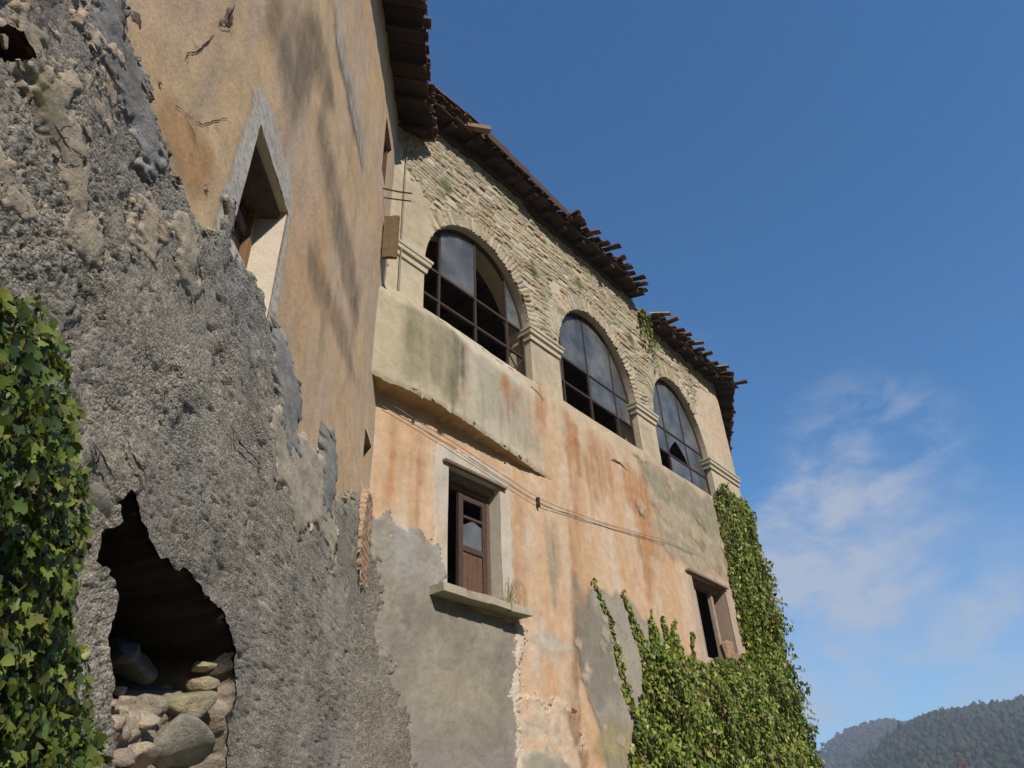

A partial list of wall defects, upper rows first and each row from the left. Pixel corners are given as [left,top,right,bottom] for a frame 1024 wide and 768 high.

crack [185,5,235,60]
crack [172,102,227,148]
spalling [0,0,709,768]
corrosion [624,469,654,586]